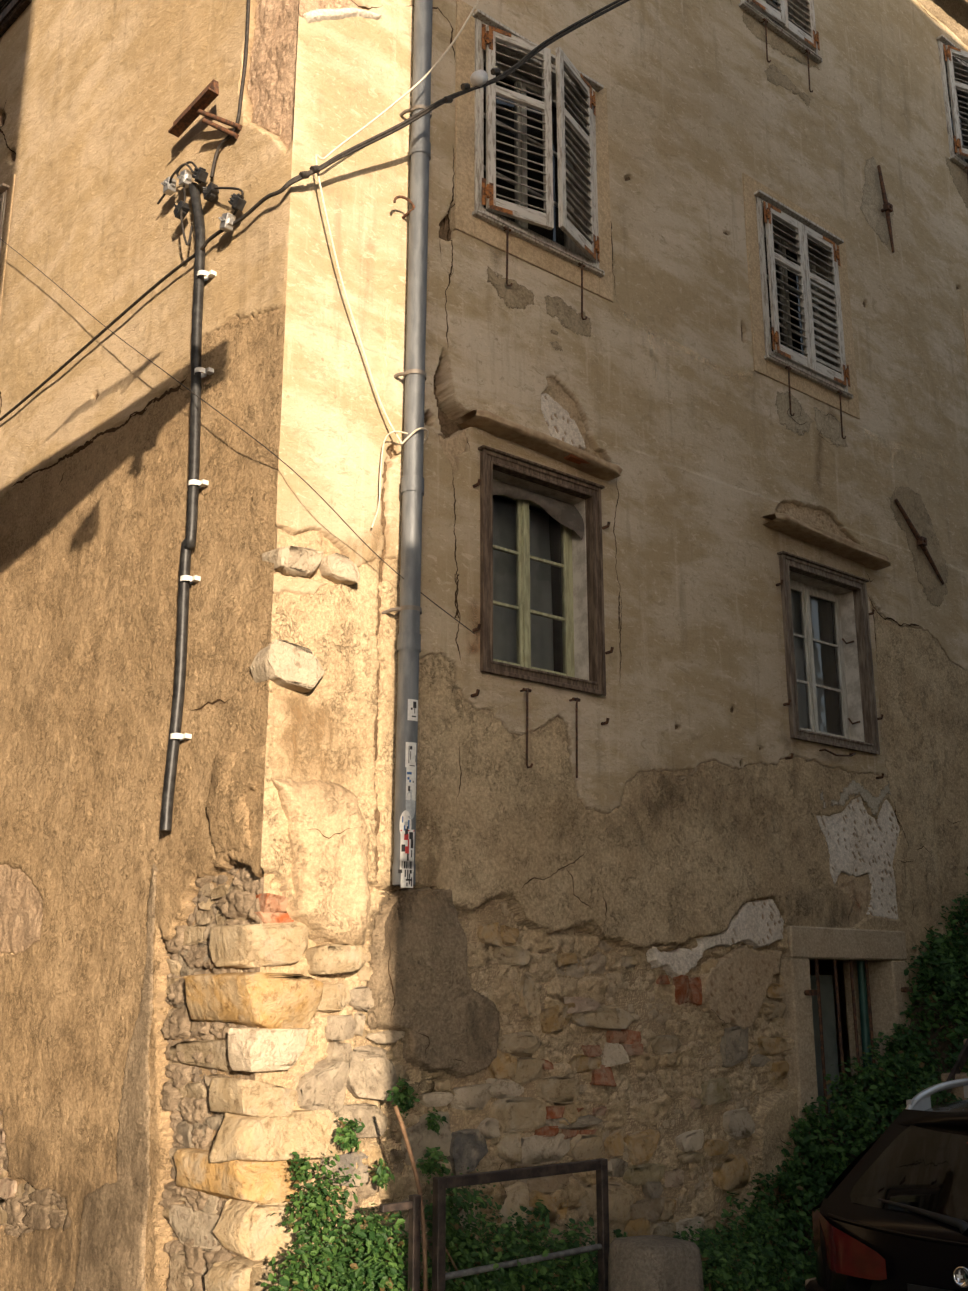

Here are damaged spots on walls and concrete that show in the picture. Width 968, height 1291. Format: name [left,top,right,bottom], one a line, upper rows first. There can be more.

spalling [247,0,366,150]
crack [351,0,456,62]
crack [13,376,188,486]
crack [452,441,470,660]
crack [613,479,622,669]
peeling [0,305,968,1291]